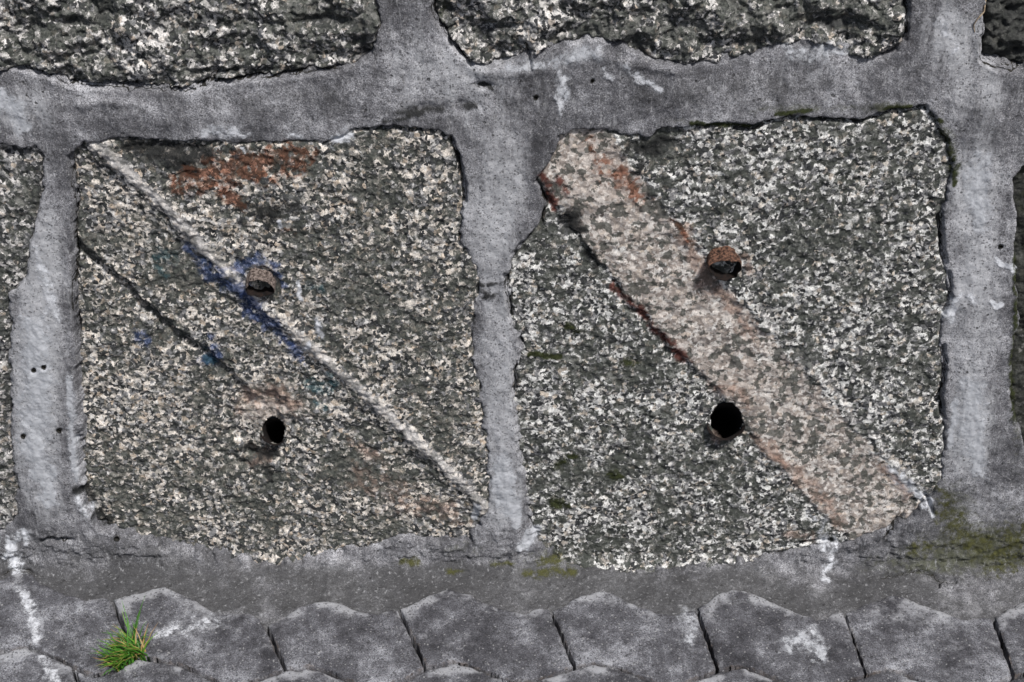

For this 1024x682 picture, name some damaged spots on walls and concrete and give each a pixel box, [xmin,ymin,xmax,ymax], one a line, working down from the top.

damp [886,465,935,518]